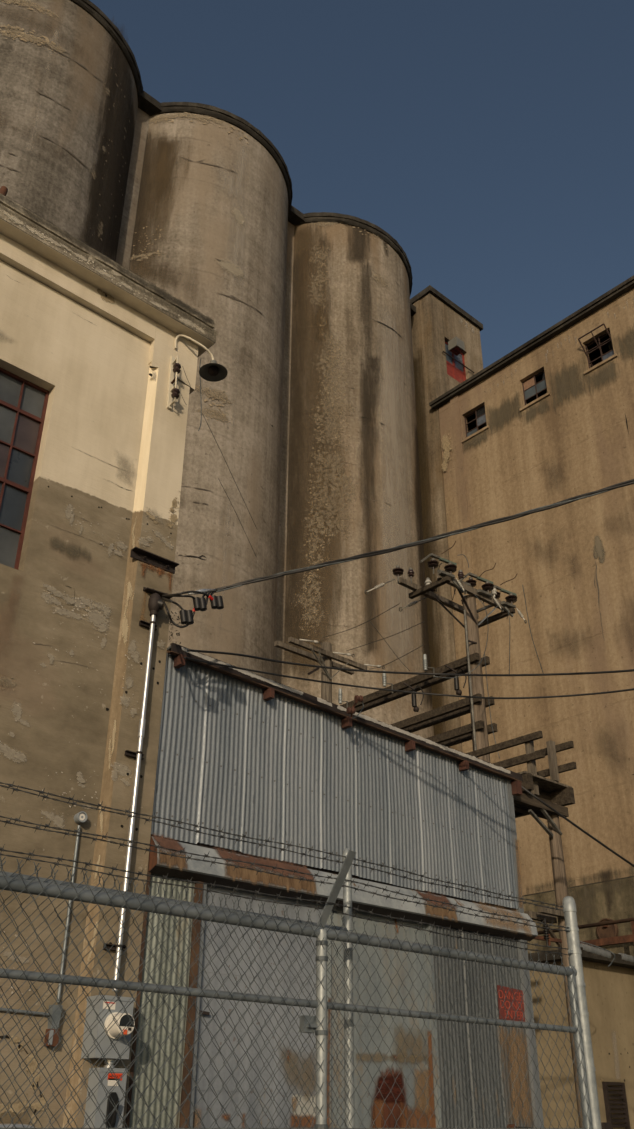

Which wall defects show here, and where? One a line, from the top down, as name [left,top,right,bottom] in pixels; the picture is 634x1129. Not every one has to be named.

leakage [0,31,212,322]
leakage [464,330,634,449]
peeling [65,496,179,557]
leakage [285,228,341,671]
leakage [361,358,377,651]
peeling [33,581,166,717]
peeling [40,771,103,834]
rust [153,834,187,870]
rust [214,847,317,894]
rust [417,891,457,921]